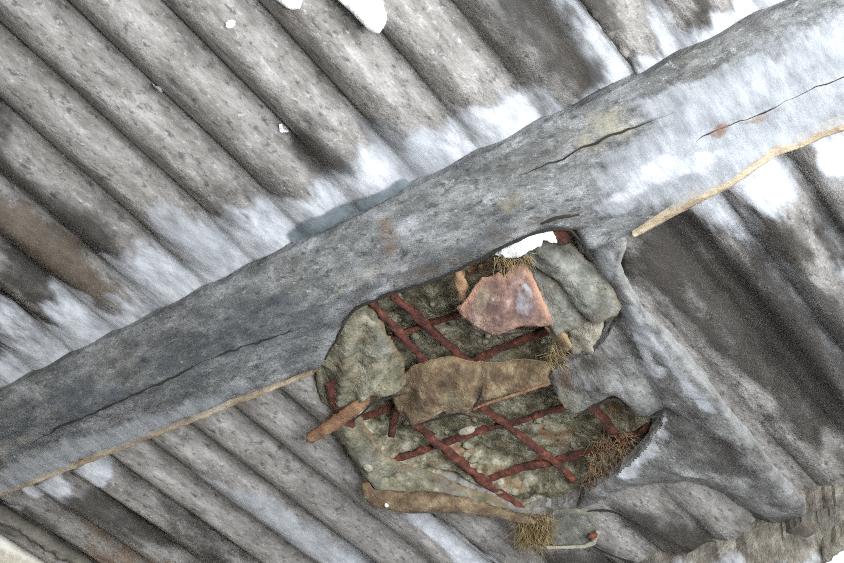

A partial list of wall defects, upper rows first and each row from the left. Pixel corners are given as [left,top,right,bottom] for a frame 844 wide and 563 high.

water stain [500,0,785,104]
crack [520,115,668,175]
crack [696,76,844,142]
water stain [0,85,562,388]
water stain [601,22,844,451]
spalling [376,235,622,373]
water stain [0,398,226,563]
water stain [404,513,498,563]
spalling [358,383,652,505]
water stain [616,511,716,553]
water stain [618,419,746,479]
spalling [785,506,844,563]